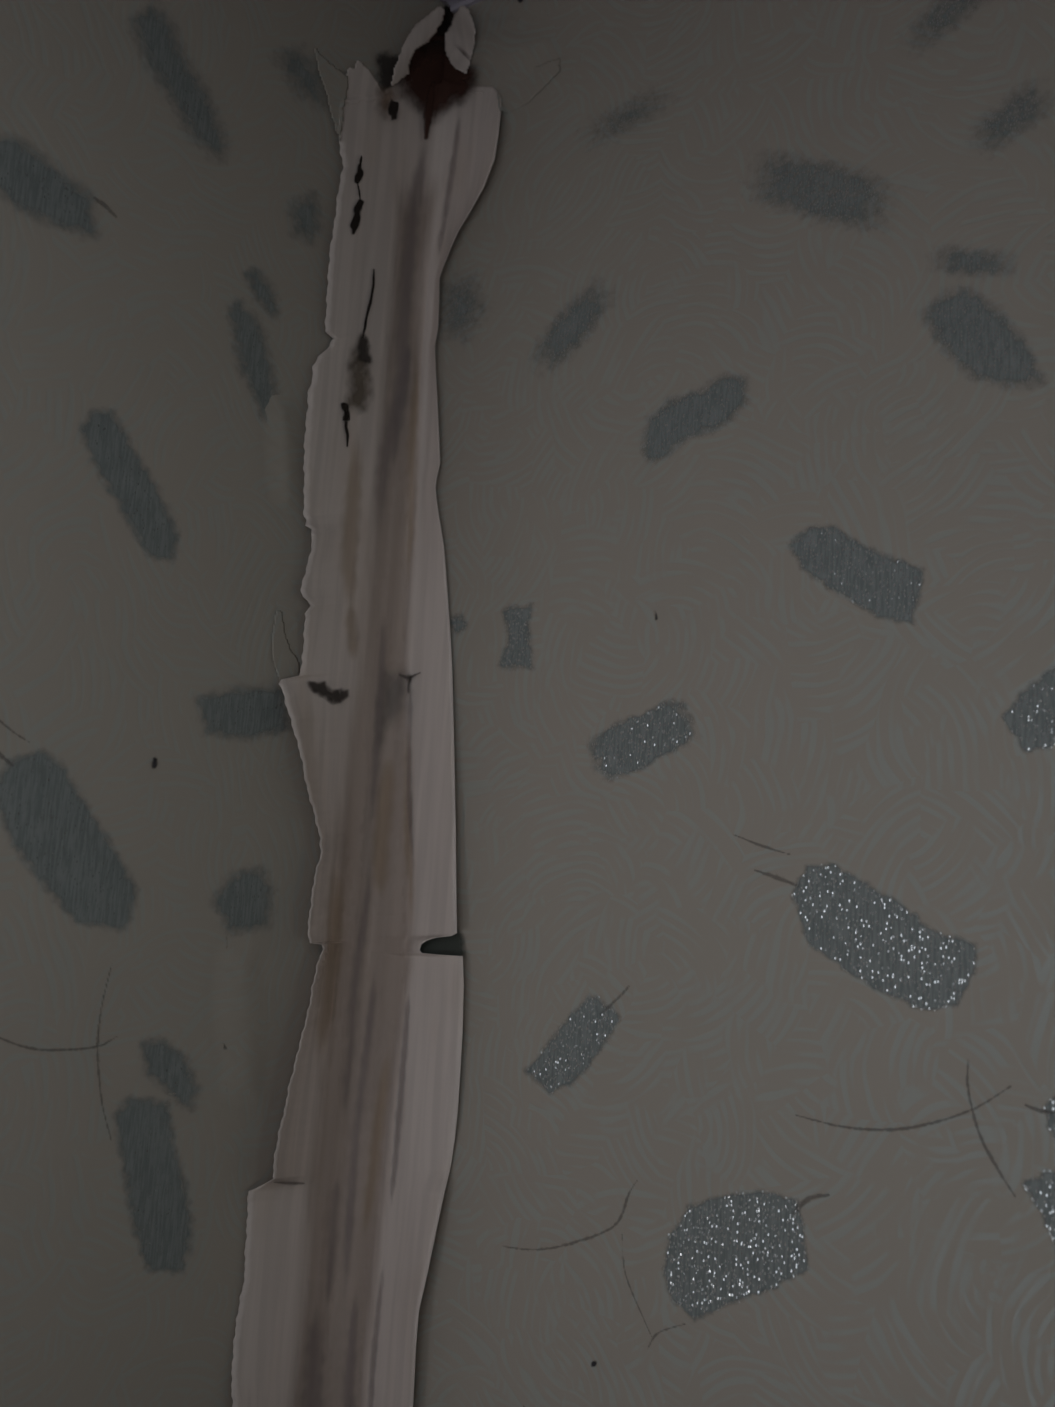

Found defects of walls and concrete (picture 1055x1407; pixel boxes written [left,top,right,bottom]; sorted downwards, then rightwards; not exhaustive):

peeling [314,5,476,140]
peeling [272,610,300,681]